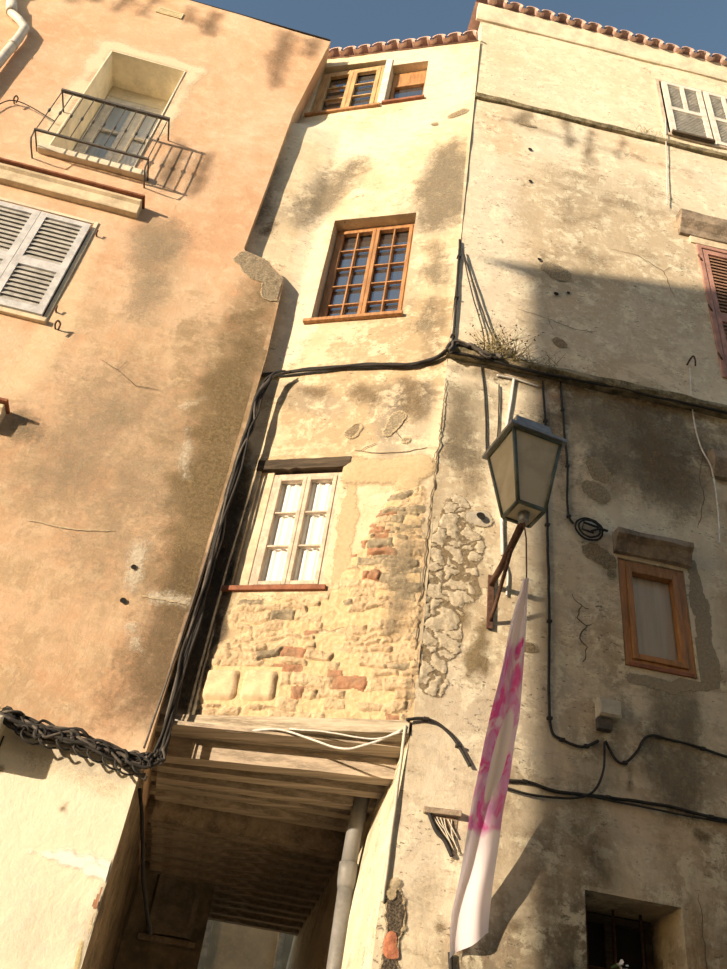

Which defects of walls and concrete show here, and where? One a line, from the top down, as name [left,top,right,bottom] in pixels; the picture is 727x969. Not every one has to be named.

water stain [416,142,466,230]
flaking render [233,250,283,301]
water stain [126,337,265,714]
flaking render [197,484,494,720]
crack [572,595,591,662]
peeling [30,849,111,933]
flaking render [379,877,406,969]